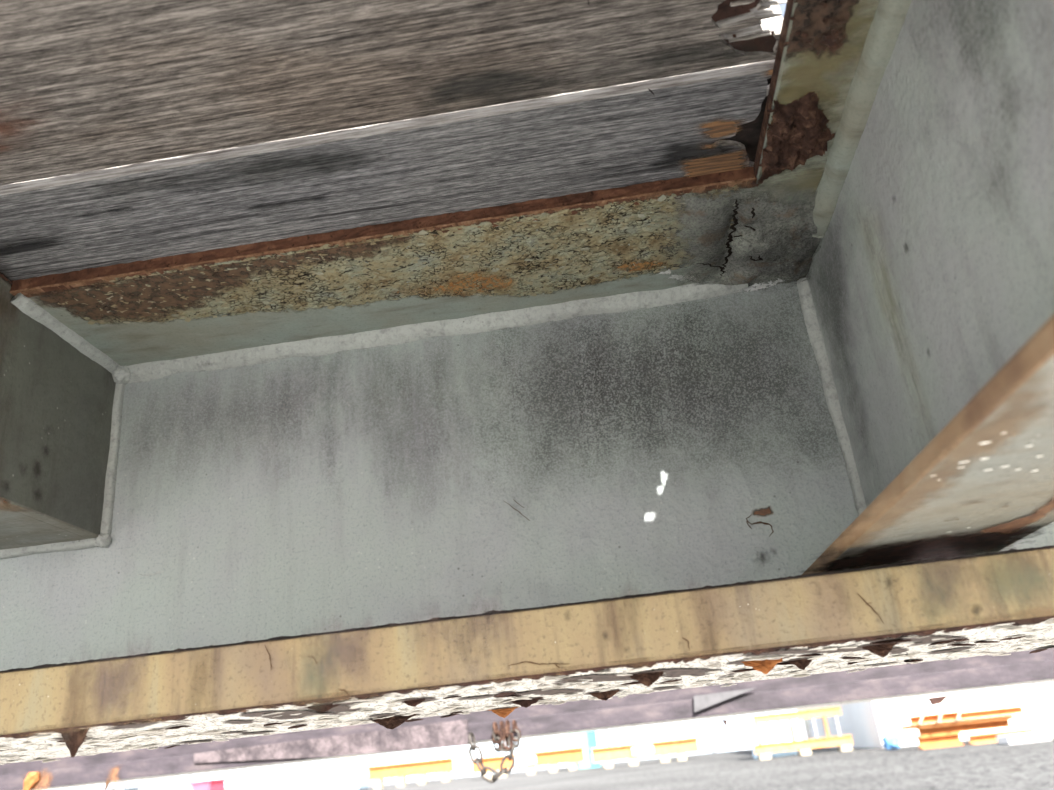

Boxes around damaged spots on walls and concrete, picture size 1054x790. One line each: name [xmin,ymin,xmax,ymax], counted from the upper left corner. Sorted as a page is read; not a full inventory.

corrosion [783,0,860,61]
corrosion [0,91,835,322]
corrosion [0,394,1054,673]
peeling [0,735,66,765]
corrosion [0,608,1054,739]
peeling [77,620,1054,756]